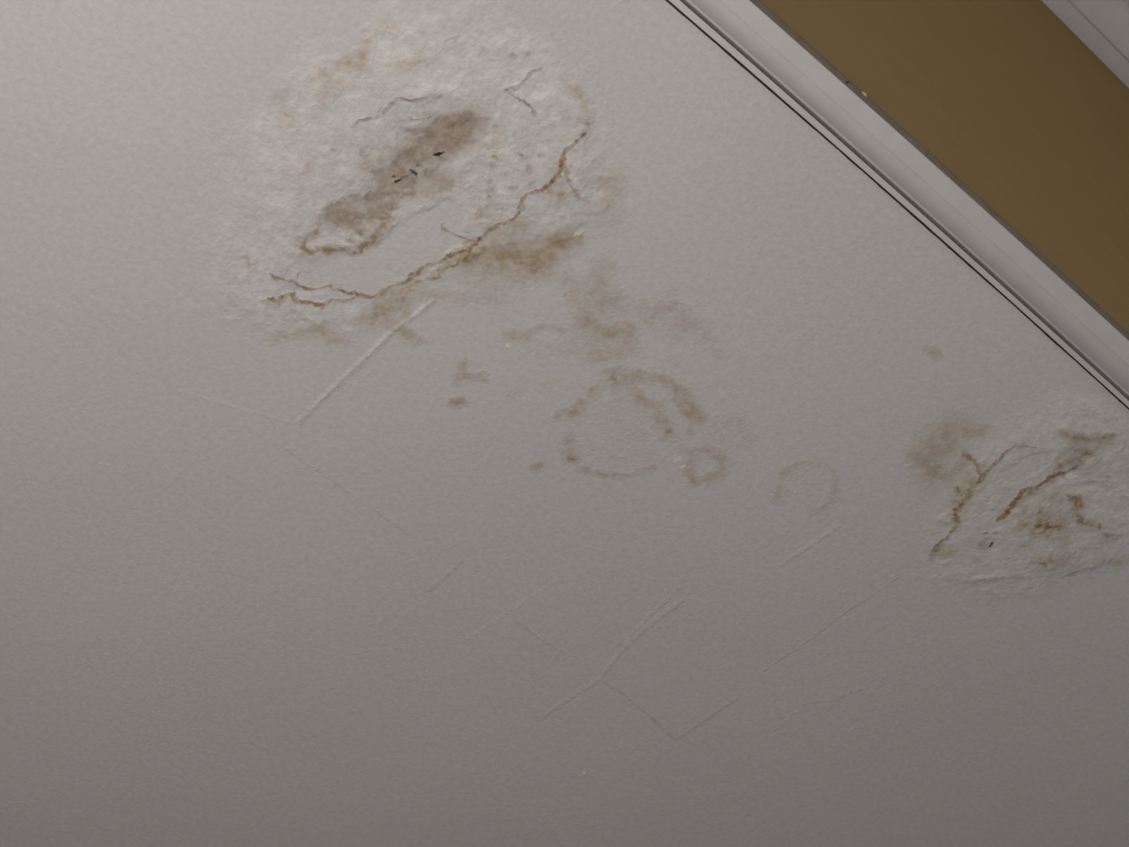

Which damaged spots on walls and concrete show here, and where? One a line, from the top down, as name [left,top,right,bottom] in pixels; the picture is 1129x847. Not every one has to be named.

crack [259,65,597,309]
leakage [261,157,761,489]
crack [665,0,1129,410]
leakage [894,399,995,502]
crack [924,443,1037,568]